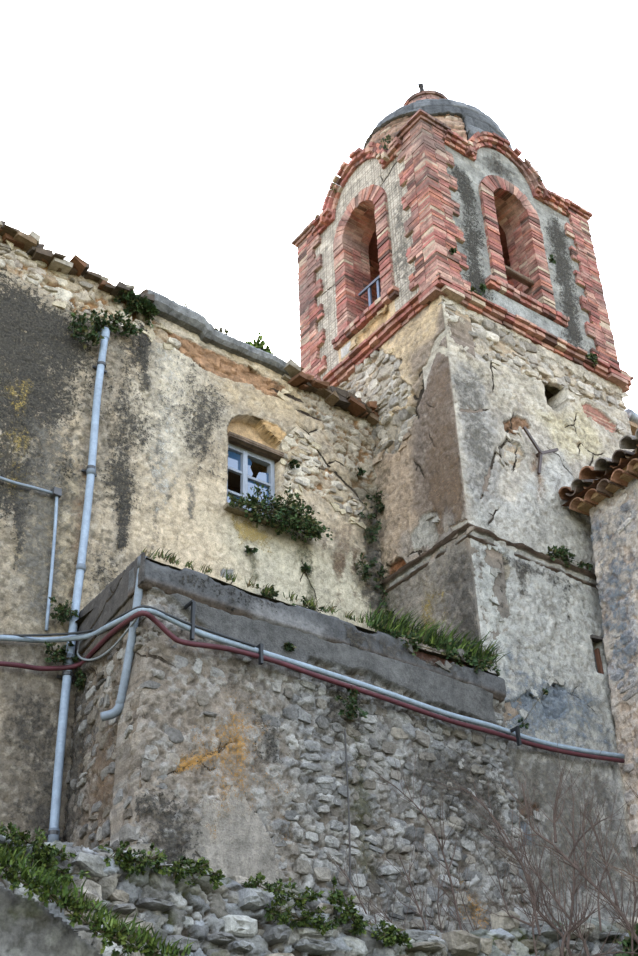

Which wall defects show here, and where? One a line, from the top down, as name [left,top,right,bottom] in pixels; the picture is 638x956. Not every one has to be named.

water stain [9,421,84,623]
water stain [115,495,132,549]
water stain [138,321,181,500]
flaking render [0,220,418,465]
flaking render [252,415,366,529]
crack [468,354,496,413]
crack [490,412,517,471]
crack [544,413,604,475]